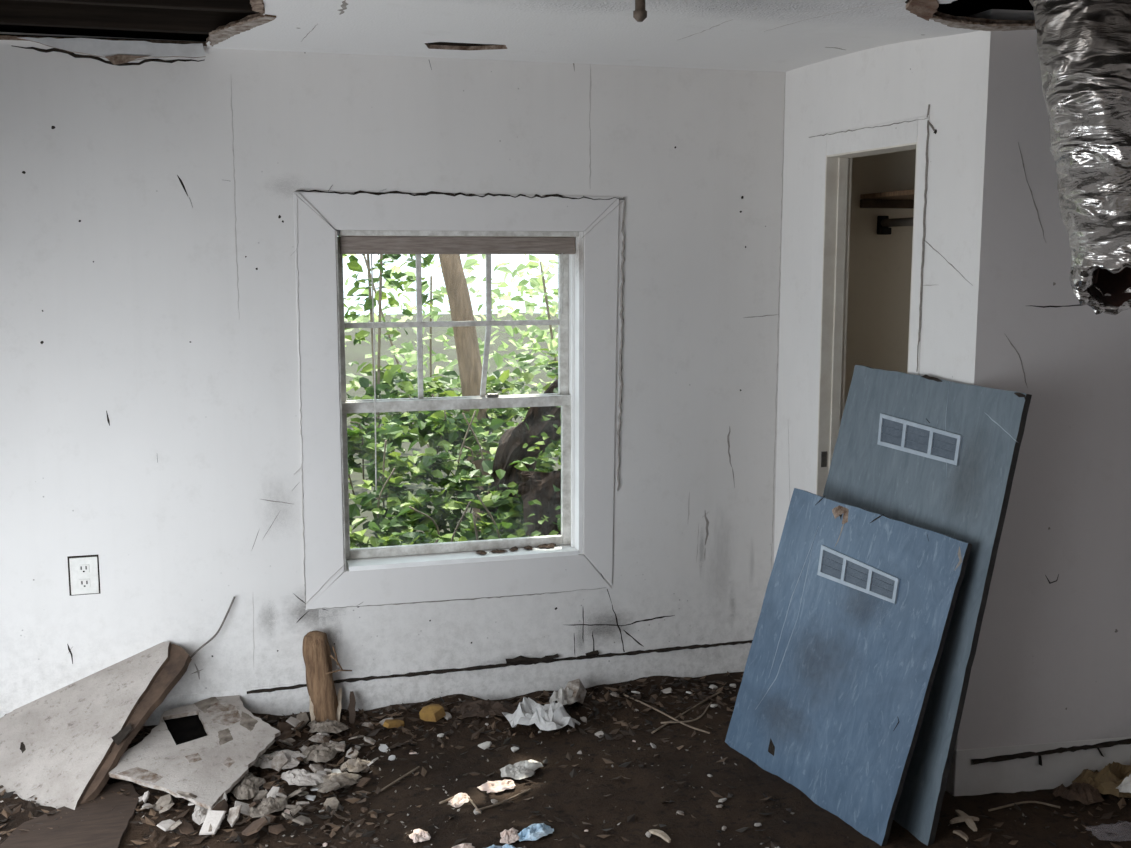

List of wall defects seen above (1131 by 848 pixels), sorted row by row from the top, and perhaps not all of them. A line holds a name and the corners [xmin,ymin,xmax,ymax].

spalling [11,0,276,66]
crack [303,0,348,39]
spalling [906,0,1036,31]
crack [293,63,753,683]
crack [247,604,307,694]